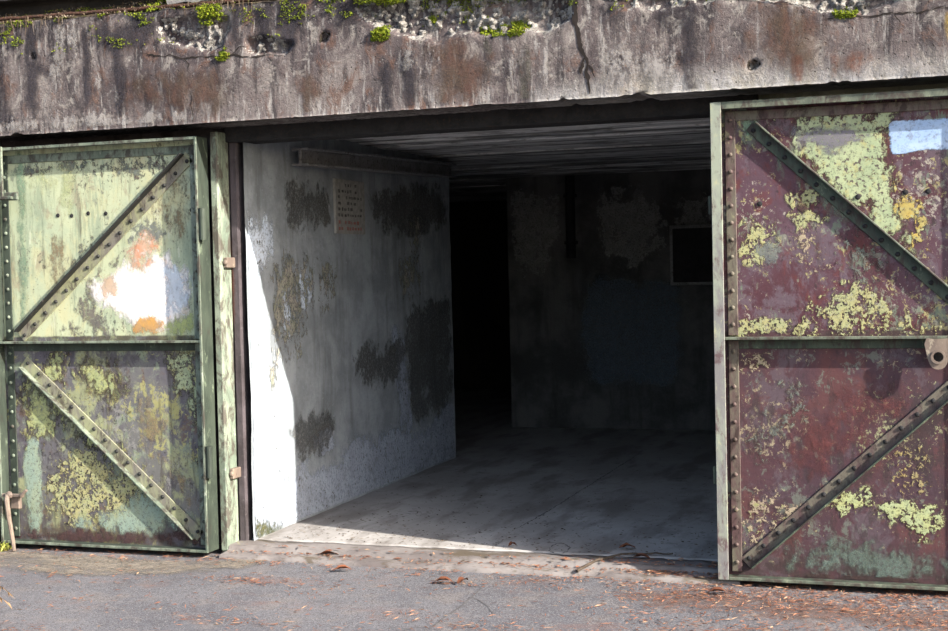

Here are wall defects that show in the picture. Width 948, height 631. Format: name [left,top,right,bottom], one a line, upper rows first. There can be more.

leakage [0,16,220,132]
leakage [256,2,302,53]
leakage [382,44,429,106]
crack [572,0,595,94]
leakage [602,0,698,89]
peeling [23,155,167,181]
peeling [773,100,932,258]
peeling [61,270,117,340]
peeling [733,189,944,337]
peeling [16,366,156,530]
peeling [742,485,802,549]
peeling [828,447,944,543]